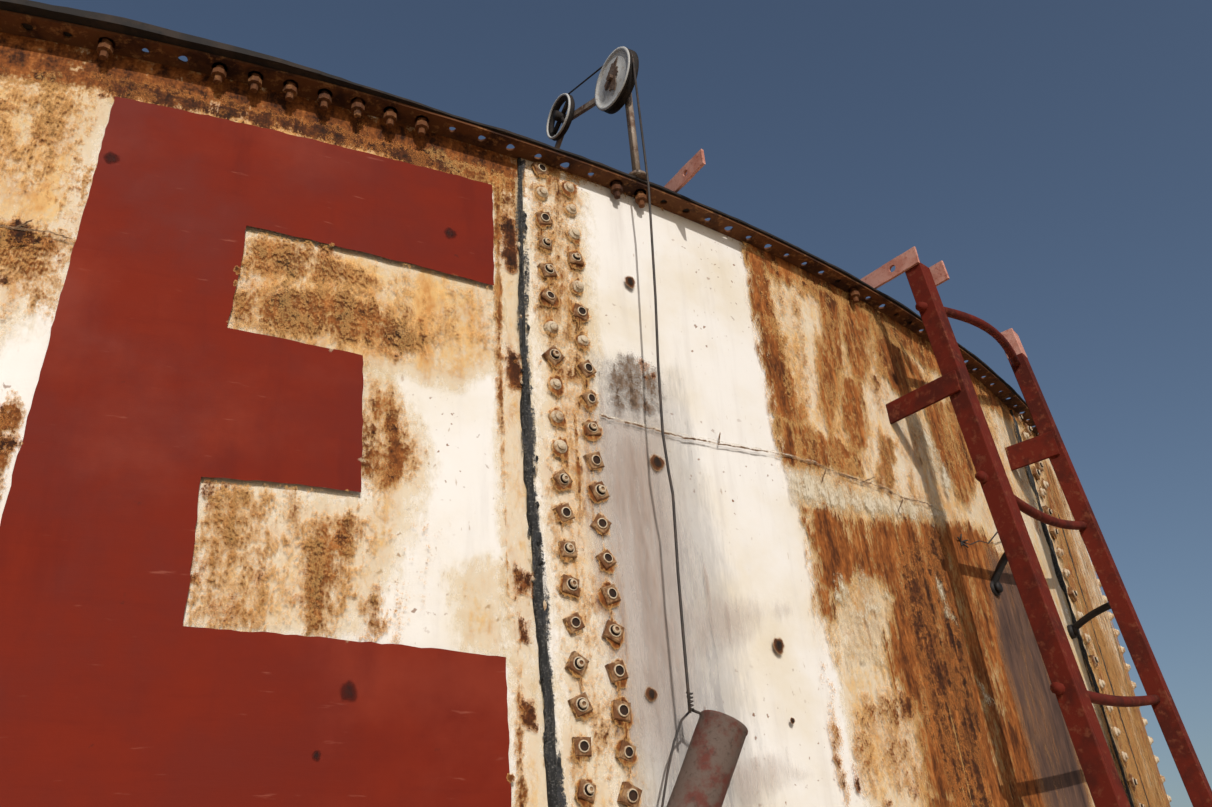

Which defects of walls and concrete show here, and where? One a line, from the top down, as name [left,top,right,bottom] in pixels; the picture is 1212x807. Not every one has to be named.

corrosion [0,32,641,807]
corrosion [645,687,658,701]
corrosion [650,454,665,471]
corrosion [742,241,1046,807]